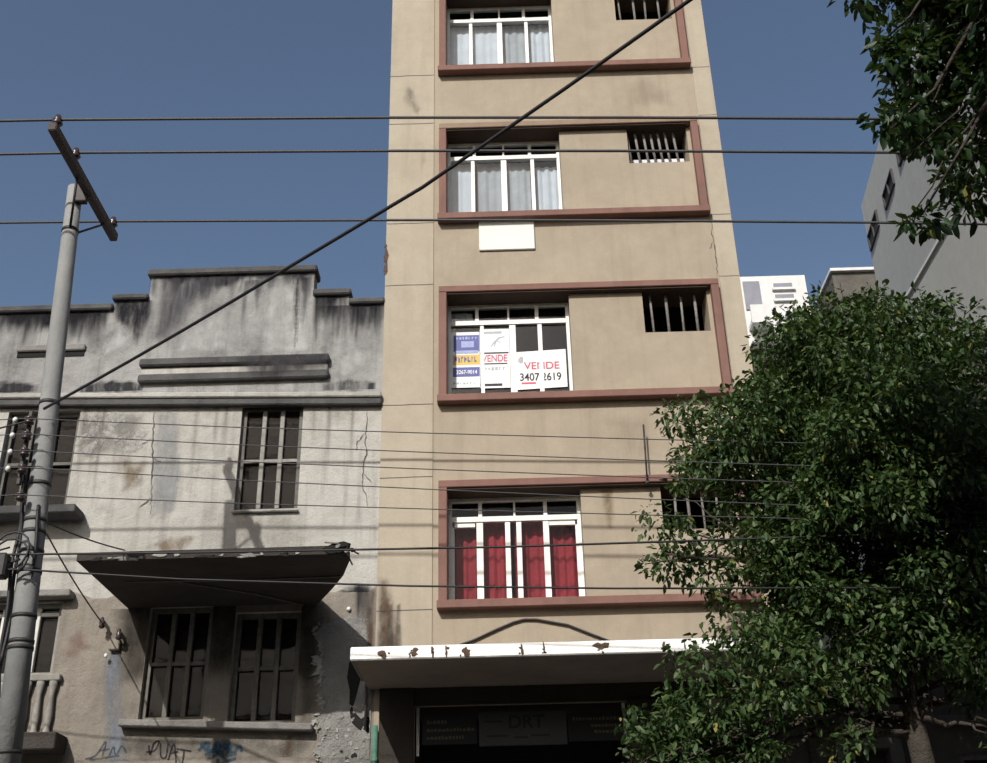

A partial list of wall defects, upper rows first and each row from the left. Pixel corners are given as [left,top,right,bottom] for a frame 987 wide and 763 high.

leakage [2,313,51,328]
leakage [68,300,150,353]
leakage [153,273,381,375]
leakage [0,382,34,393]
leakage [80,380,143,392]
leakage [324,350,375,391]
crack [133,415,161,513]
crack [356,414,371,501]
spalling [311,613,390,763]